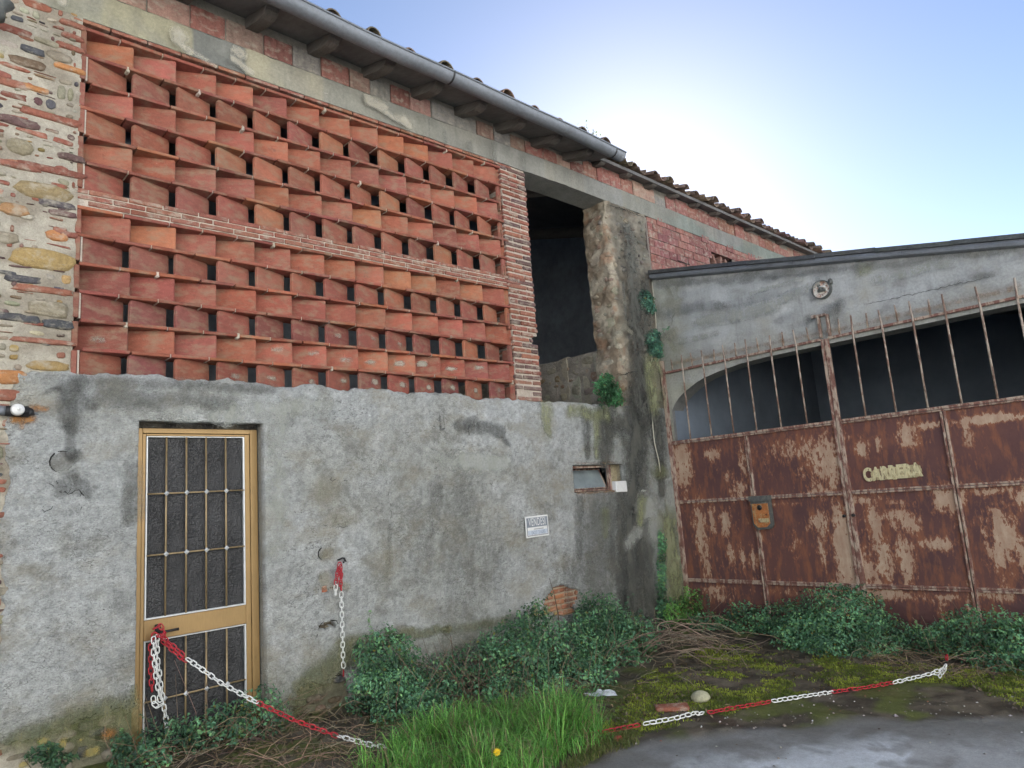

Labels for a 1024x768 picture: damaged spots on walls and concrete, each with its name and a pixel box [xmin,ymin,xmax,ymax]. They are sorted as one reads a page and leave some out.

spalling [544,585,578,616]
water stain [584,222,808,635]